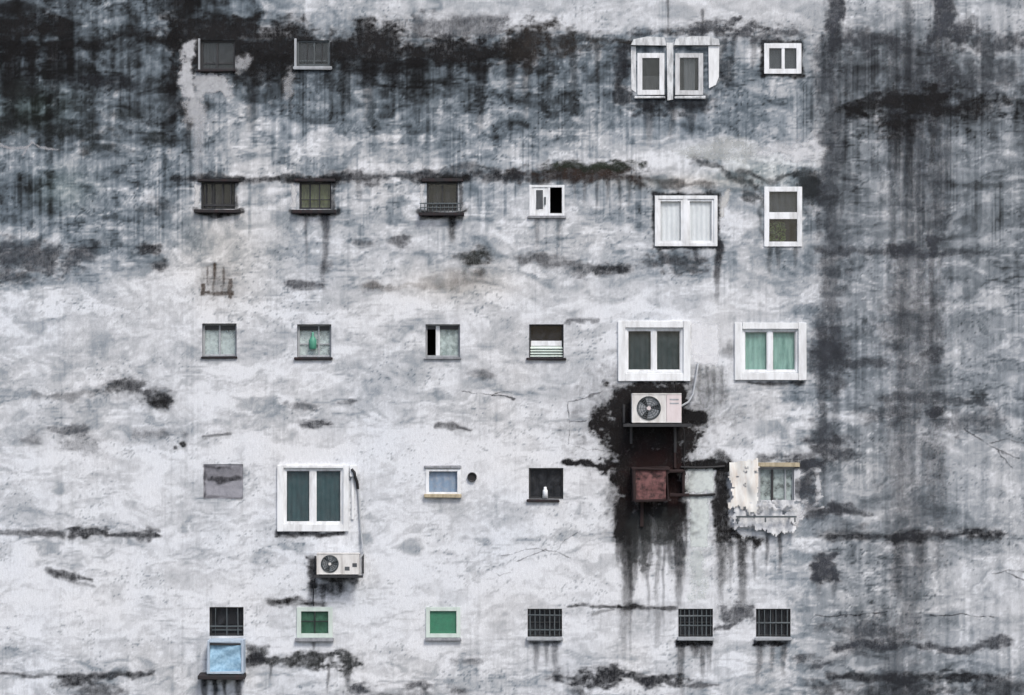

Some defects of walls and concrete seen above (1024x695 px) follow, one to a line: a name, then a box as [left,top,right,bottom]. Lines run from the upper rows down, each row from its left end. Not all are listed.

damp [0,0,805,129]
damp [321,165,523,185]
damp [697,0,1024,395]
damp [107,378,172,408]
peeling [791,467,824,527]
damp [760,423,859,517]
damp [0,527,160,541]
damp [809,528,1005,584]
damp [268,596,325,607]
damp [246,647,368,693]
damp [552,664,710,694]
damp [796,622,1022,695]